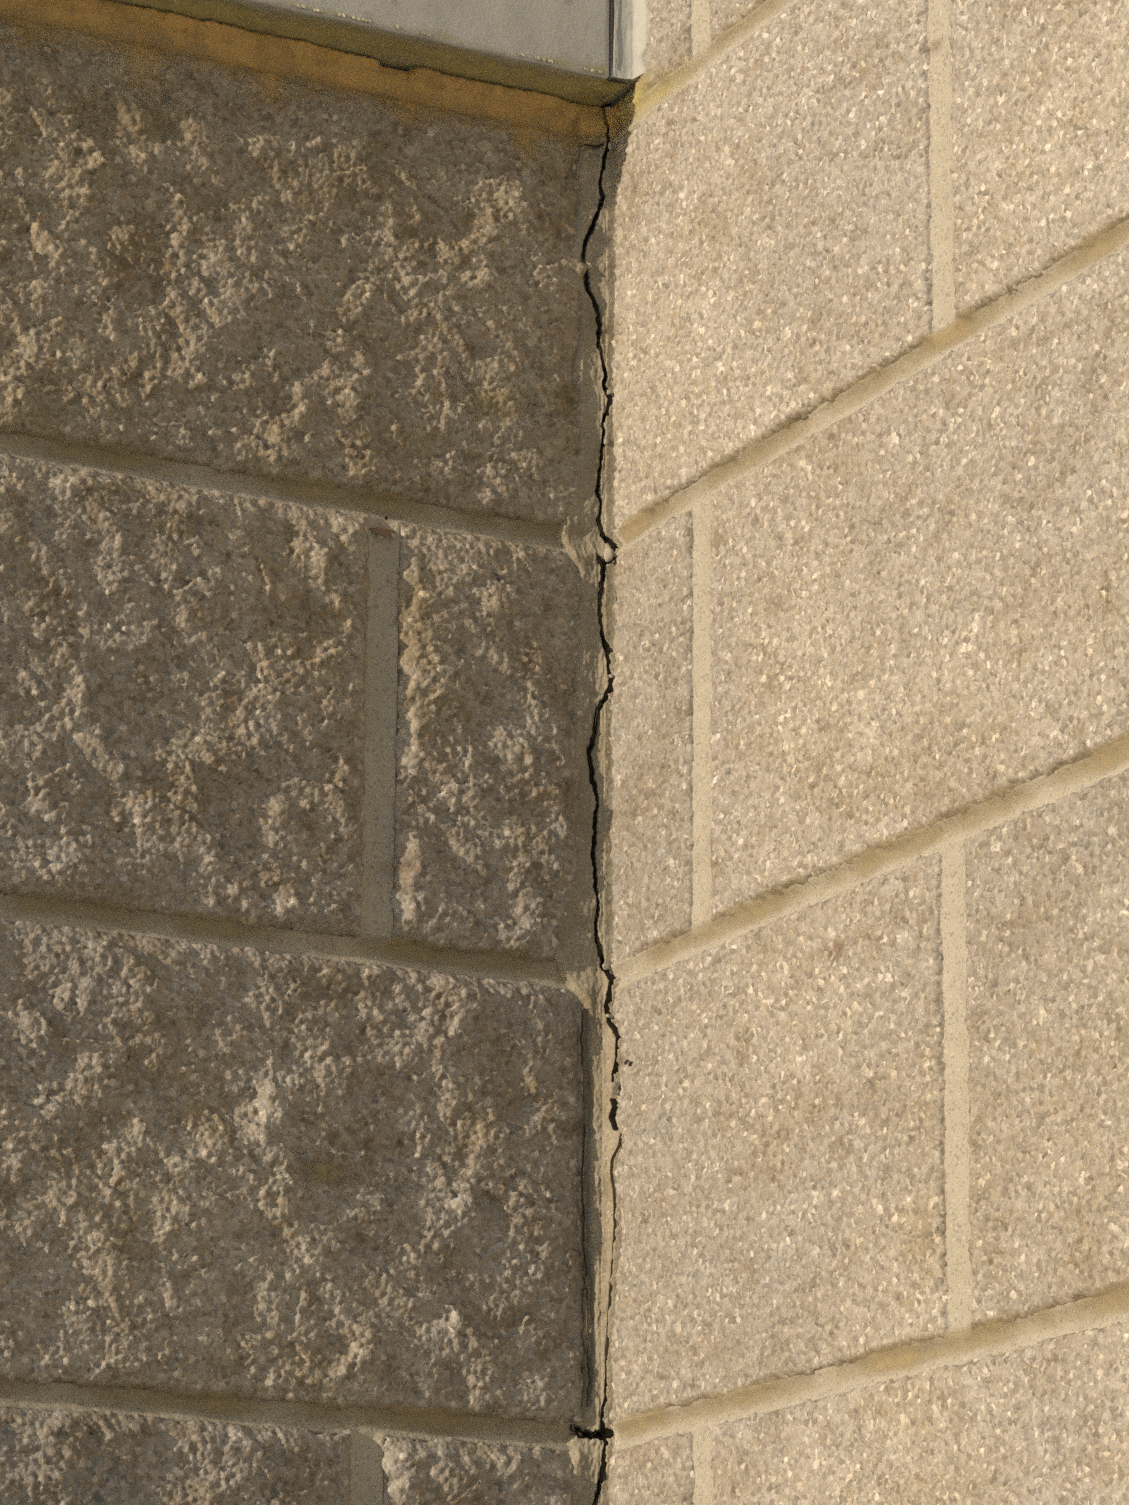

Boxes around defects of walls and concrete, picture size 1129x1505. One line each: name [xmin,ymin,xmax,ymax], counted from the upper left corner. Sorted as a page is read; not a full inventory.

crack [577,105,622,1505]